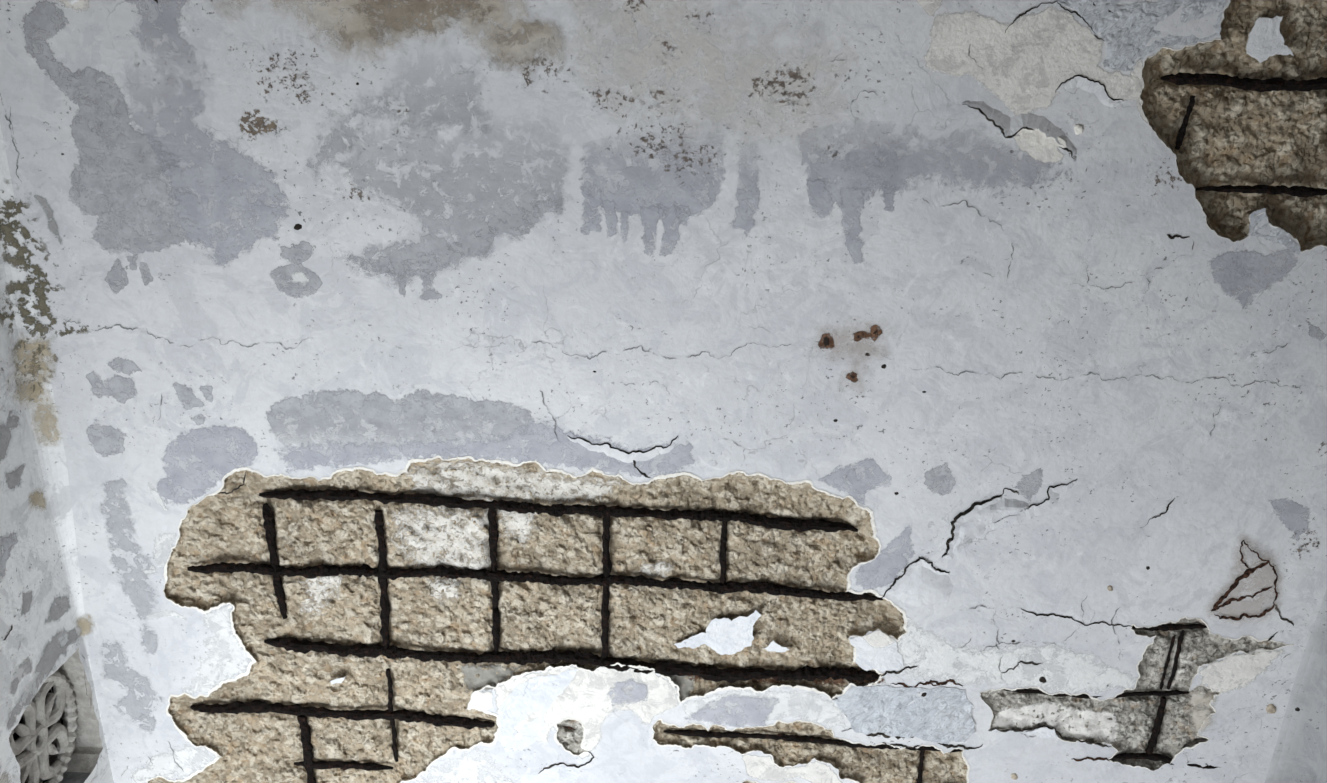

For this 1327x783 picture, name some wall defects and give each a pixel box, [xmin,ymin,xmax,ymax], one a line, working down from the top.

water stain [240,110,286,141]
water stain [249,49,334,105]
water stain [273,0,570,93]
water stain [802,144,905,264]
spalling [847,0,1327,307]
water stain [0,191,99,442]
crack [540,391,679,478]
water stain [29,491,45,508]
water stain [78,617,92,635]
spalling [102,382,1294,783]
crack [881,479,1077,599]
crack [1211,540,1294,657]